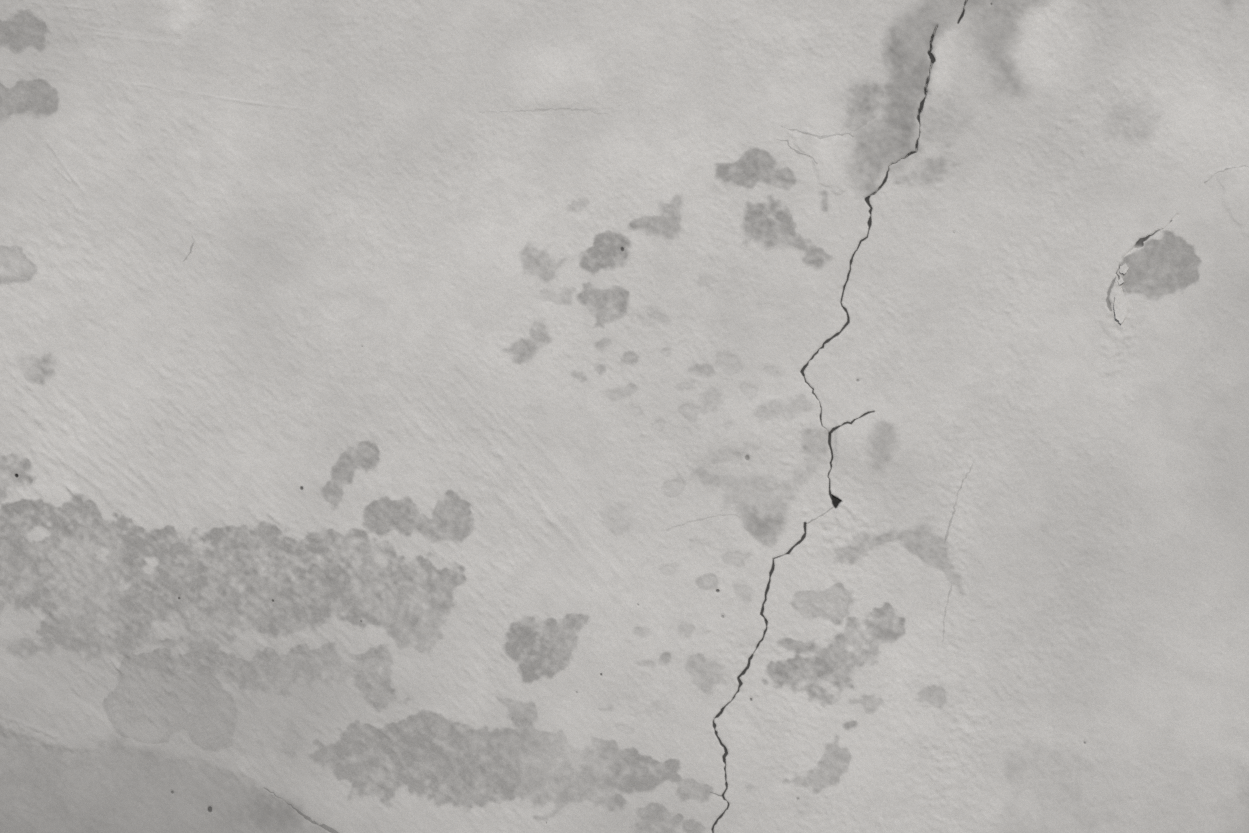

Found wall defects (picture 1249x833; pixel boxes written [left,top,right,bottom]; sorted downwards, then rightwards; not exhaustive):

damp [830,0,1063,208]
peeling [1105,219,1204,324]
crack [709,0,968,833]
crack [945,463,974,541]